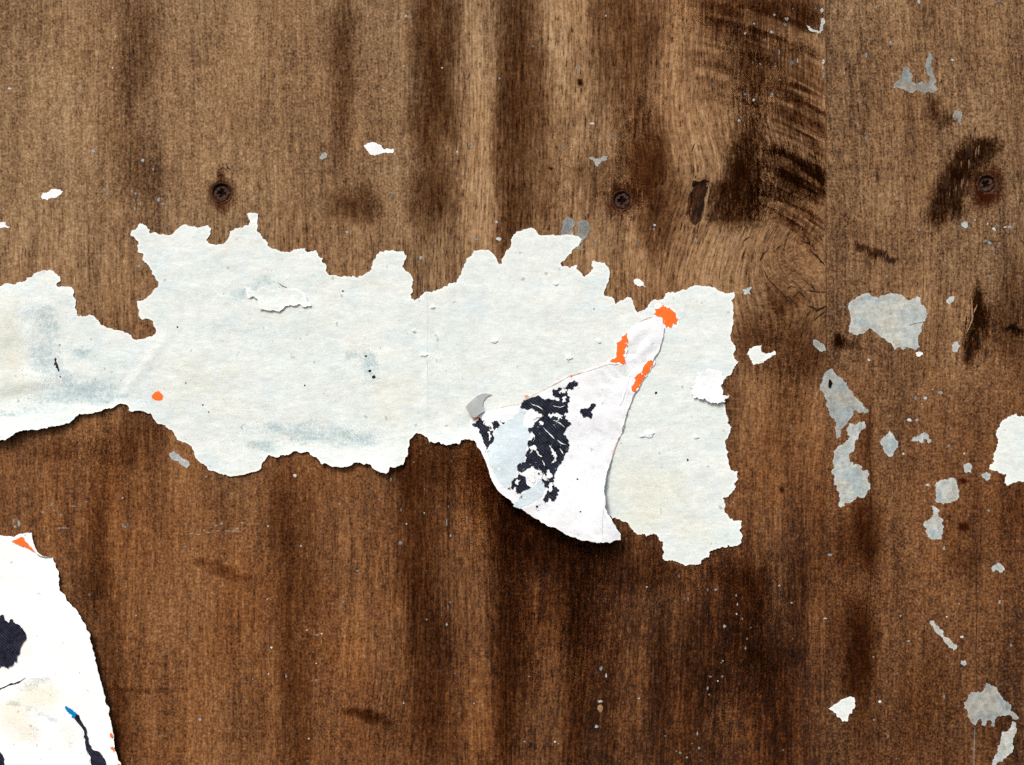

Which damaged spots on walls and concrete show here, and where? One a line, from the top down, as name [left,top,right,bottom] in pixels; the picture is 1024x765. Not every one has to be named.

peeling [483,389,567,509]